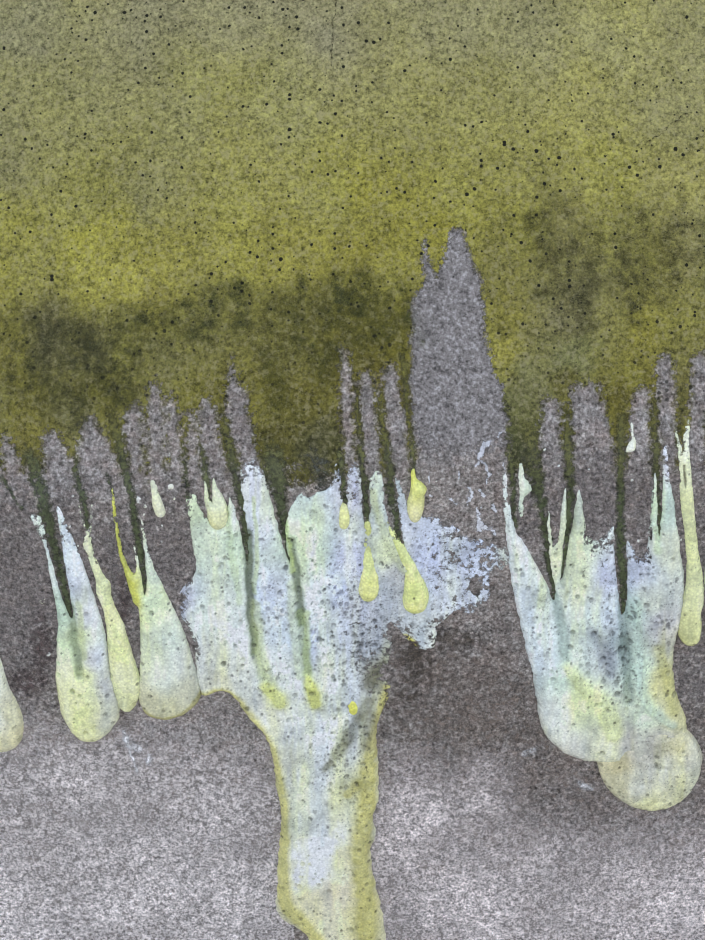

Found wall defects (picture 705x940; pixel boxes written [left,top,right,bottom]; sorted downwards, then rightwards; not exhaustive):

damp [0,325,196,706]
damp [199,444,212,502]
damp [220,407,250,561]
damp [260,438,290,561]
damp [305,433,348,505]
damp [354,387,370,522]
damp [377,393,403,544]
damp [399,352,416,474]
peeling [408,229,510,536]
damp [505,397,687,614]
damp [693,494,705,566]
damp [372,611,705,940]